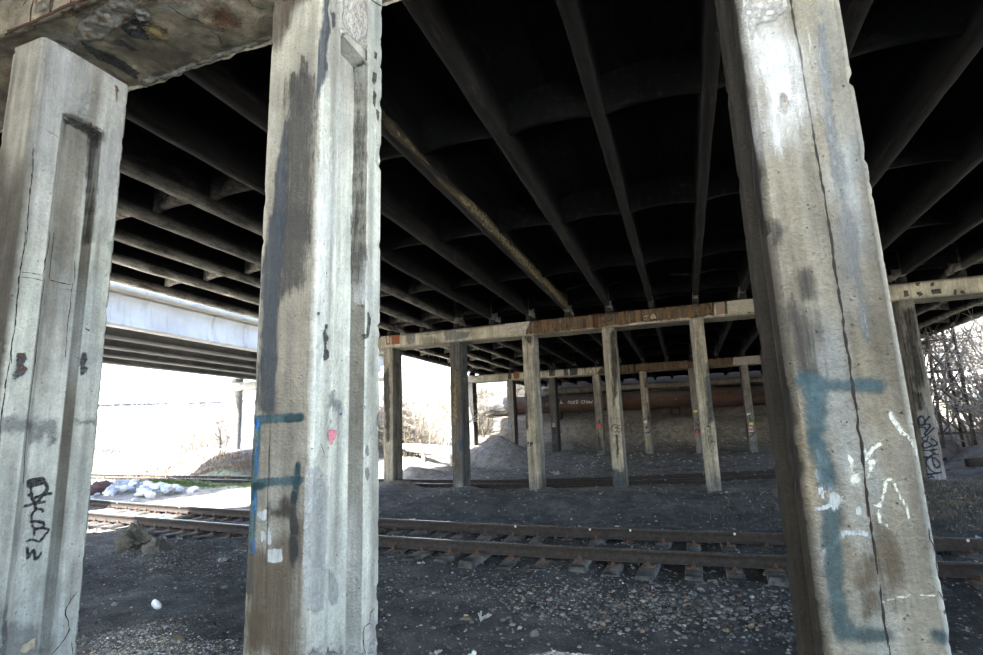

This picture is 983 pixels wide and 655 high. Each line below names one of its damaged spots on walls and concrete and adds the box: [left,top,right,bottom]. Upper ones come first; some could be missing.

spalling [6,0,86,33]
spalling [76,0,170,51]
spalling [742,0,788,39]
spalling [780,91,789,113]
water stain [255,0,335,414]
crack [0,129,75,483]
crack [790,0,891,655]